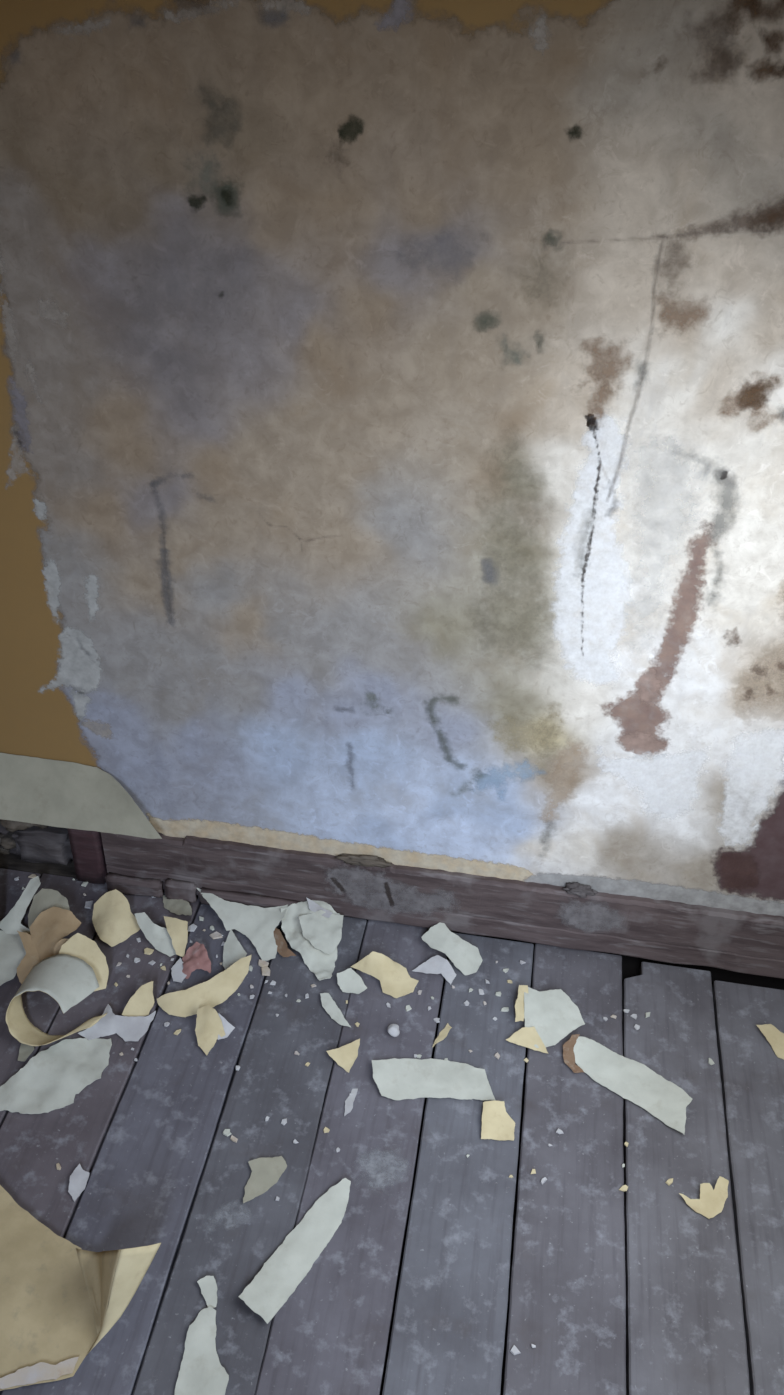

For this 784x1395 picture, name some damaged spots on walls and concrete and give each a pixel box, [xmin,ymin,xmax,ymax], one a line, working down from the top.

water stain [189,184,237,212]
water stain [338,118,363,141]
peeling [0,0,784,917]
crack [581,416,601,614]
corrosion [602,471,735,754]